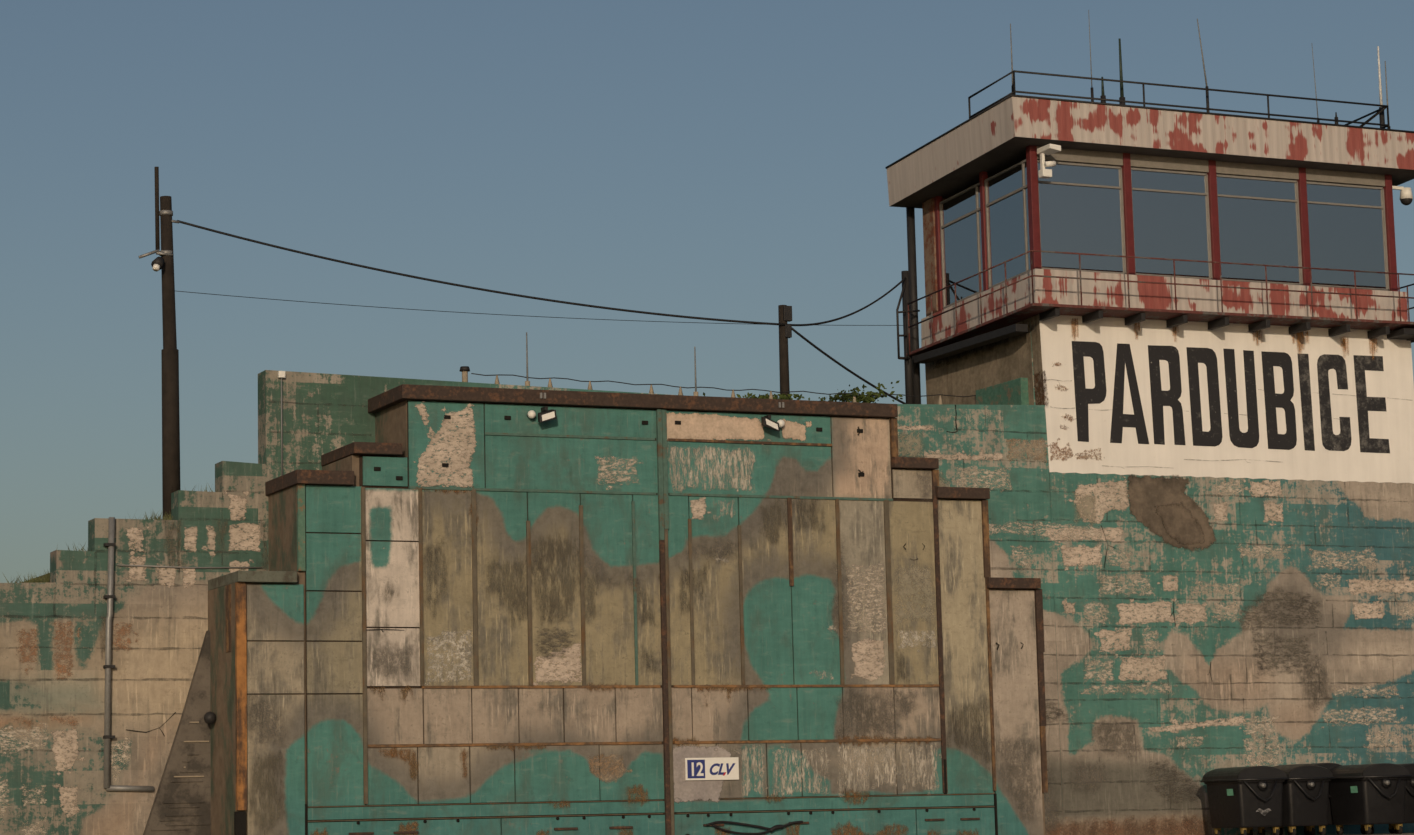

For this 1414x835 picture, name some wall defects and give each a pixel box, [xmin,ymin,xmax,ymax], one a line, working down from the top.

peeling [124,527,196,590]
peeling [184,490,262,573]
peeling [414,401,477,490]
peeling [666,412,812,520]
peeling [898,414,1101,491]
peeling [989,476,1241,694]
leakage [1127,475,1216,551]
peeling [1210,479,1283,526]
peeling [1308,549,1414,620]
peeling [0,716,84,835]
peeling [673,743,942,802]
peeling [1145,716,1283,766]